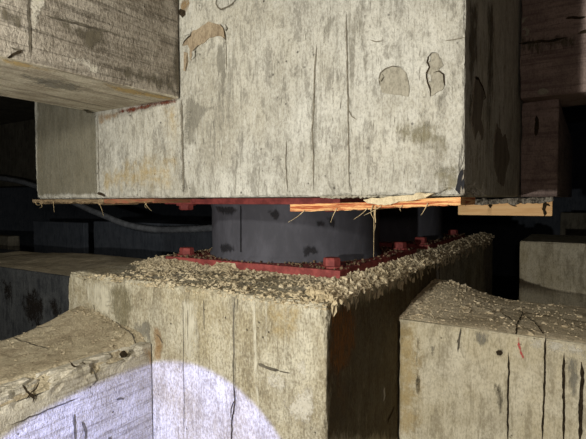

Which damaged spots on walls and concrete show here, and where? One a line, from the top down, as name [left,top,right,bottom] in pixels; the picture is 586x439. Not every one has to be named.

peeling [182,21,227,71]
rust [119,100,176,113]
crack [310,44,318,189]
crack [346,18,355,176]
peeling [378,66,410,97]
peeling [426,52,445,97]
leakage [22,289,62,327]
crack [11,383,76,425]
crack [230,297,238,439]
crack [477,306,550,439]
crack [562,356,584,439]